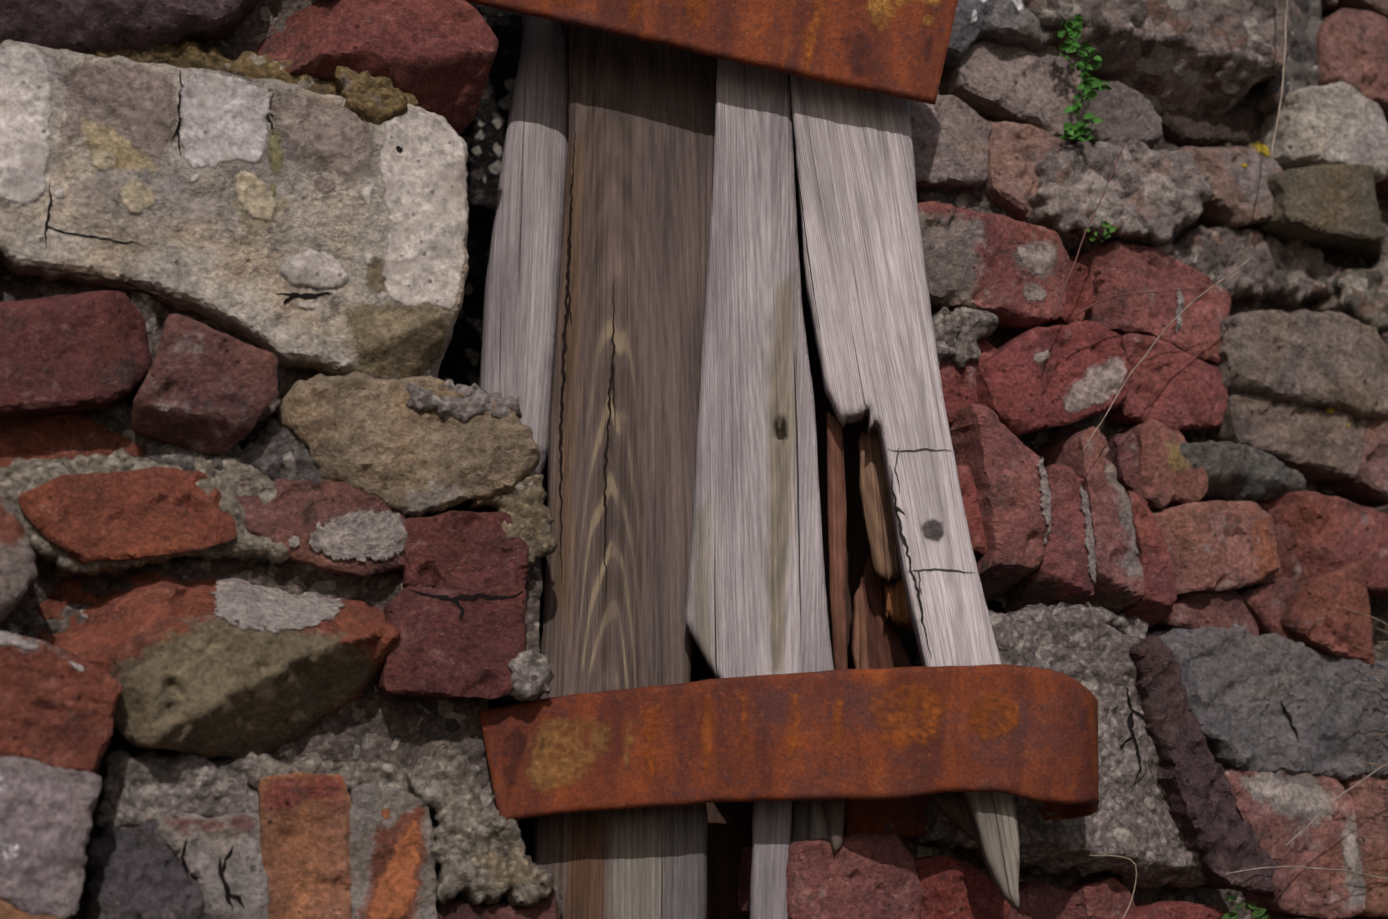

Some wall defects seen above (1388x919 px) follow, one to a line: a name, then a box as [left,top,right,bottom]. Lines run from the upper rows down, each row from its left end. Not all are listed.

crack [171,71,184,156]
crack [44,182,148,247]
crack [559,124,576,583]
crack [603,275,616,595]
crack [409,590,524,622]
crack [181,837,245,912]